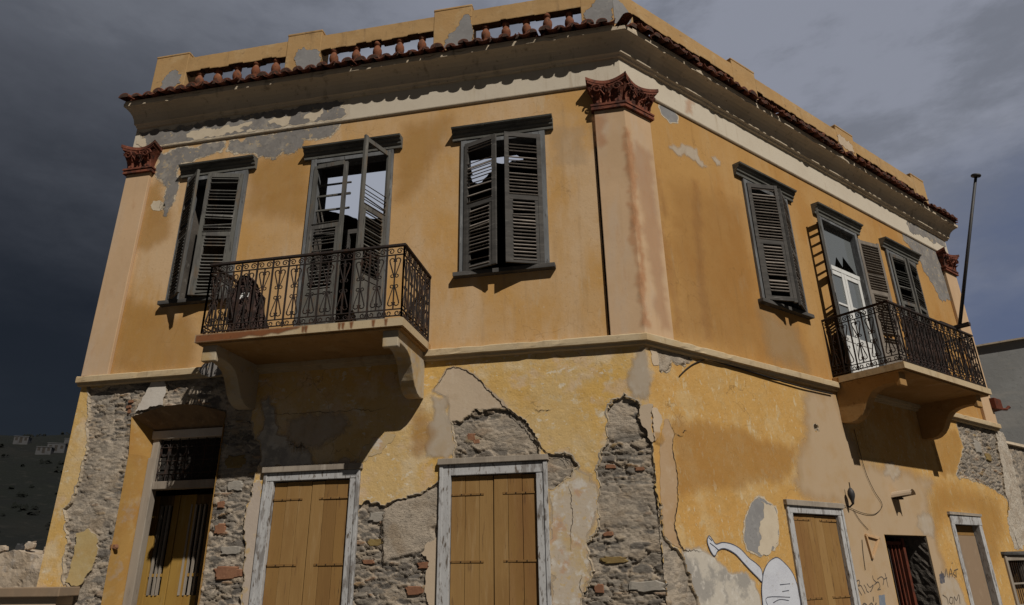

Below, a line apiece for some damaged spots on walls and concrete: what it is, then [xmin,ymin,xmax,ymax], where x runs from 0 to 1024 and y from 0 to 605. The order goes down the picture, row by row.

flaking render [444,14,475,48]
peeling [136,100,348,217]
peeling [669,144,720,167]
peeling [902,222,951,302]
flaking render [60,362,314,605]
flaking render [353,481,439,605]
flaking render [425,347,762,605]
flaking render [742,495,779,557]
flaking render [956,422,1024,551]